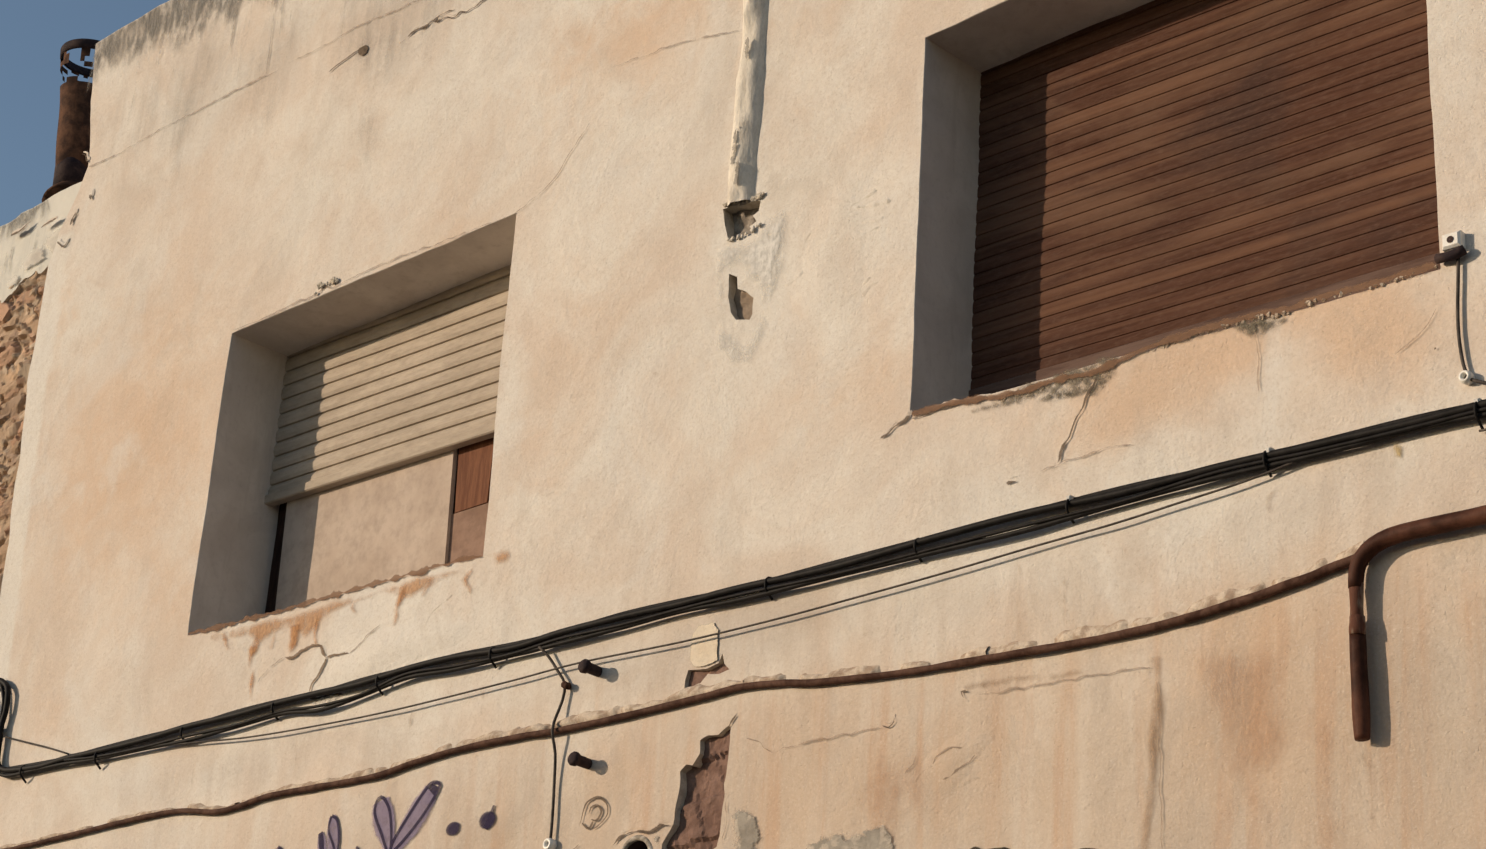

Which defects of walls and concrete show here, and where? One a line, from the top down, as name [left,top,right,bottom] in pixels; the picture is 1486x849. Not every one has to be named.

water stain [88,0,240,82]
crack [408,0,484,36]
flaking render [720,192,782,358]
flaking render [0,266,48,593]
crack [881,393,991,438]
crack [1058,379,1096,462]
corrosion [249,603,343,687]
crack [188,555,481,692]
corrosion [395,578,431,621]
flaking render [580,796,608,830]
flaking render [654,726,760,849]
peeling [806,825,893,849]